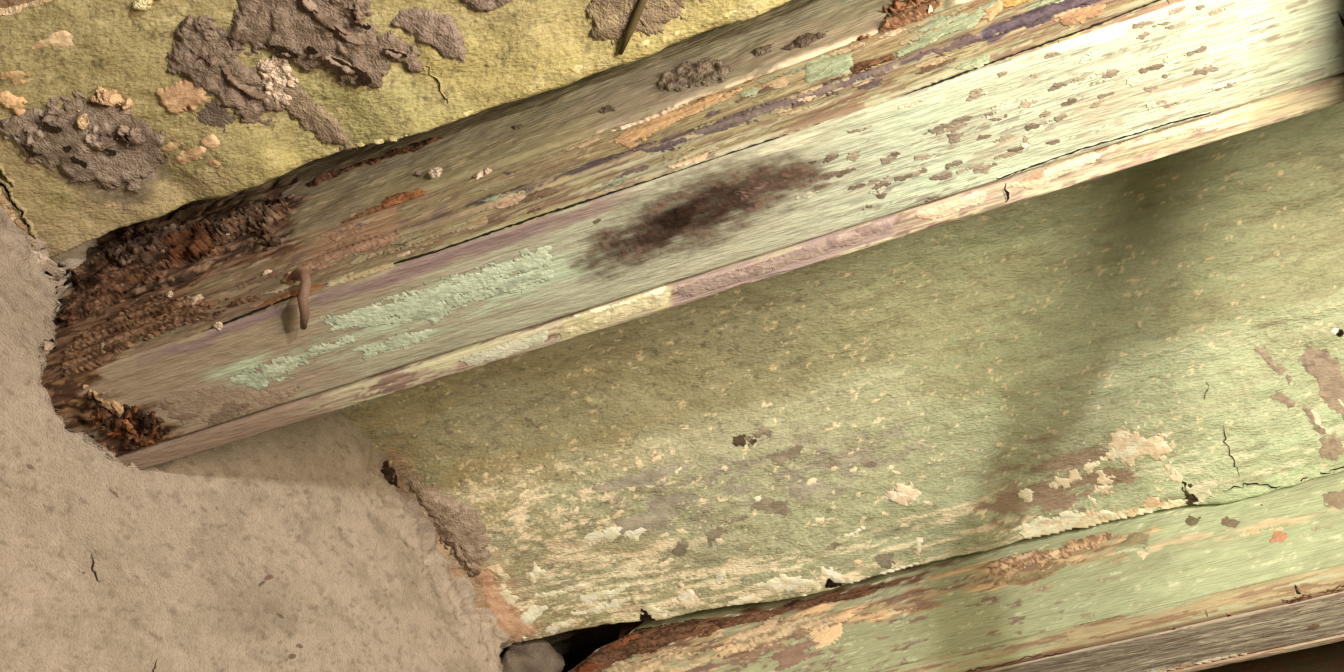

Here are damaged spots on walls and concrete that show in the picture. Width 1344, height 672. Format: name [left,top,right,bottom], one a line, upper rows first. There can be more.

flaking render [0,70,33,117]
peeling [32,30,74,49]
flaking render [156,77,209,115]
flaking render [354,134,407,149]
peeling [552,0,1106,191]
peeling [1133,5,1226,39]
peeling [214,170,559,308]
water stain [572,162,822,277]
peeling [460,45,1238,366]
peeling [229,245,555,390]
peeling [1254,345,1344,460]
peeling [986,421,1221,585]